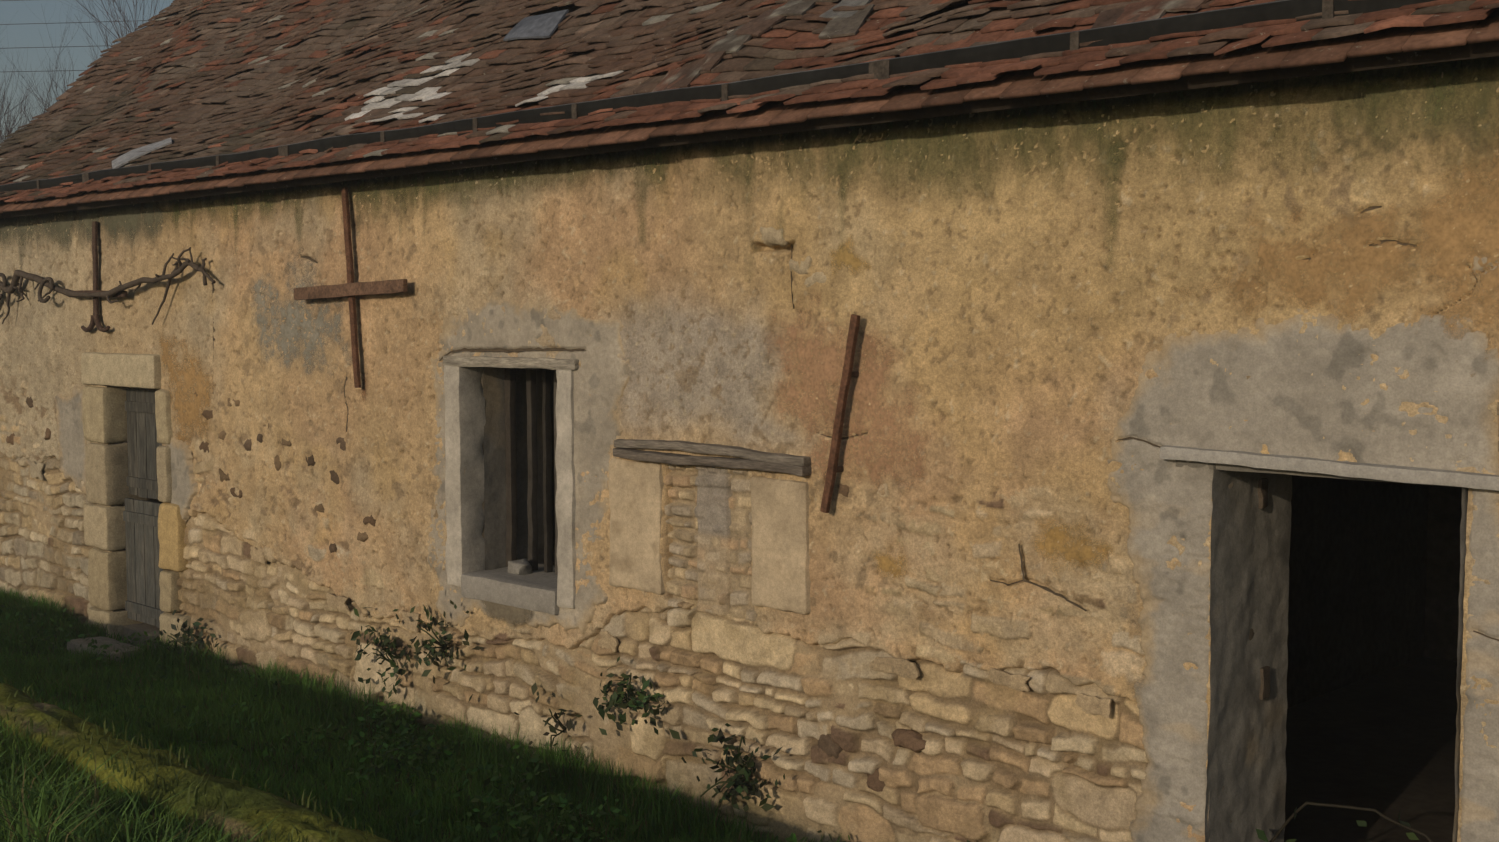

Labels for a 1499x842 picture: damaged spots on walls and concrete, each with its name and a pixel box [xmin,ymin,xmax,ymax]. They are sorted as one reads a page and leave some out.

damp [1233,147,1499,331]
damp [254,264,348,372]
crack [990,544,1087,611]
spalling [818,734,843,759]
spalling [867,768,885,792]
spalling [891,728,926,753]